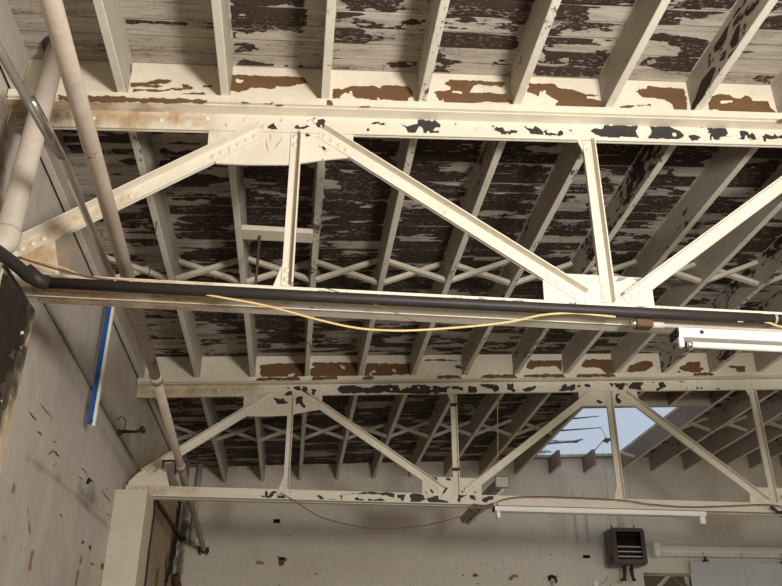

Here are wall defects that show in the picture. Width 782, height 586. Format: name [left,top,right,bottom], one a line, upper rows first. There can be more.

corrosion [50,104,71,123]
peeling [243,166,289,227]
peeling [230,0,308,92]
peeling [293,145,391,293]
peeling [403,119,484,207]
peeling [433,0,534,103]
peeling [527,0,636,107]
peeling [591,124,782,286]
peeling [620,0,782,123]
damp [0,271,32,431]
peeling [167,311,666,467]
damp [148,500,188,586]